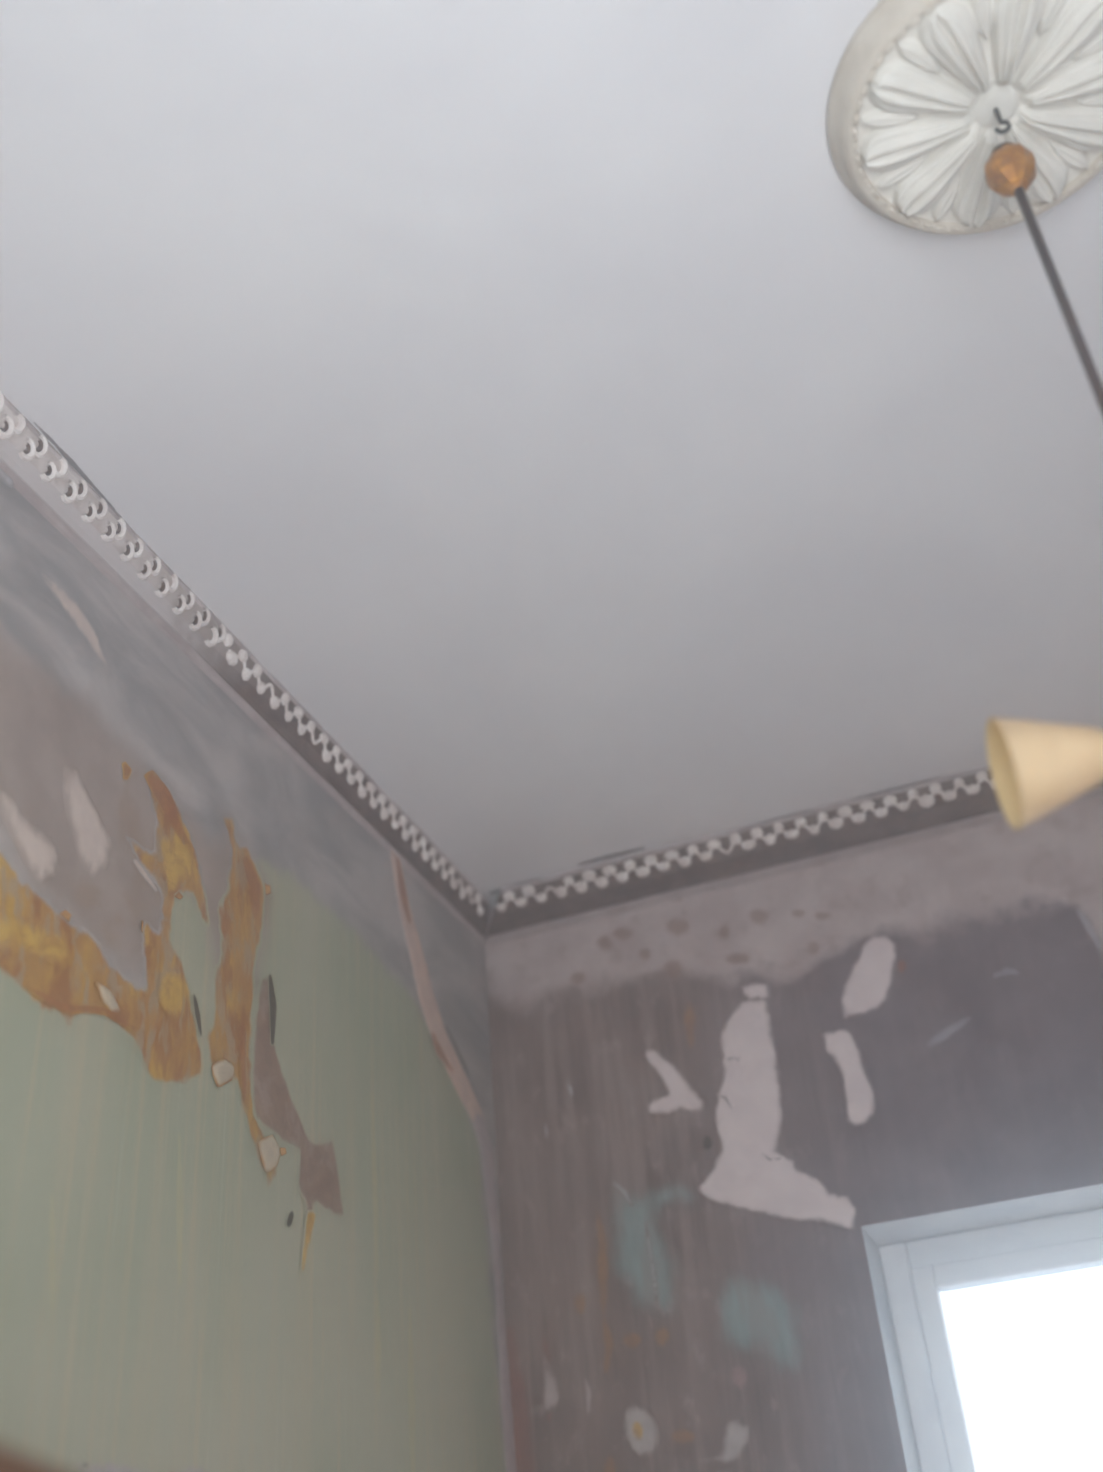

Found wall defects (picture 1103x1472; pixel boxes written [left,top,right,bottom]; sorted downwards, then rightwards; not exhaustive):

peeling [0,610,345,1273]